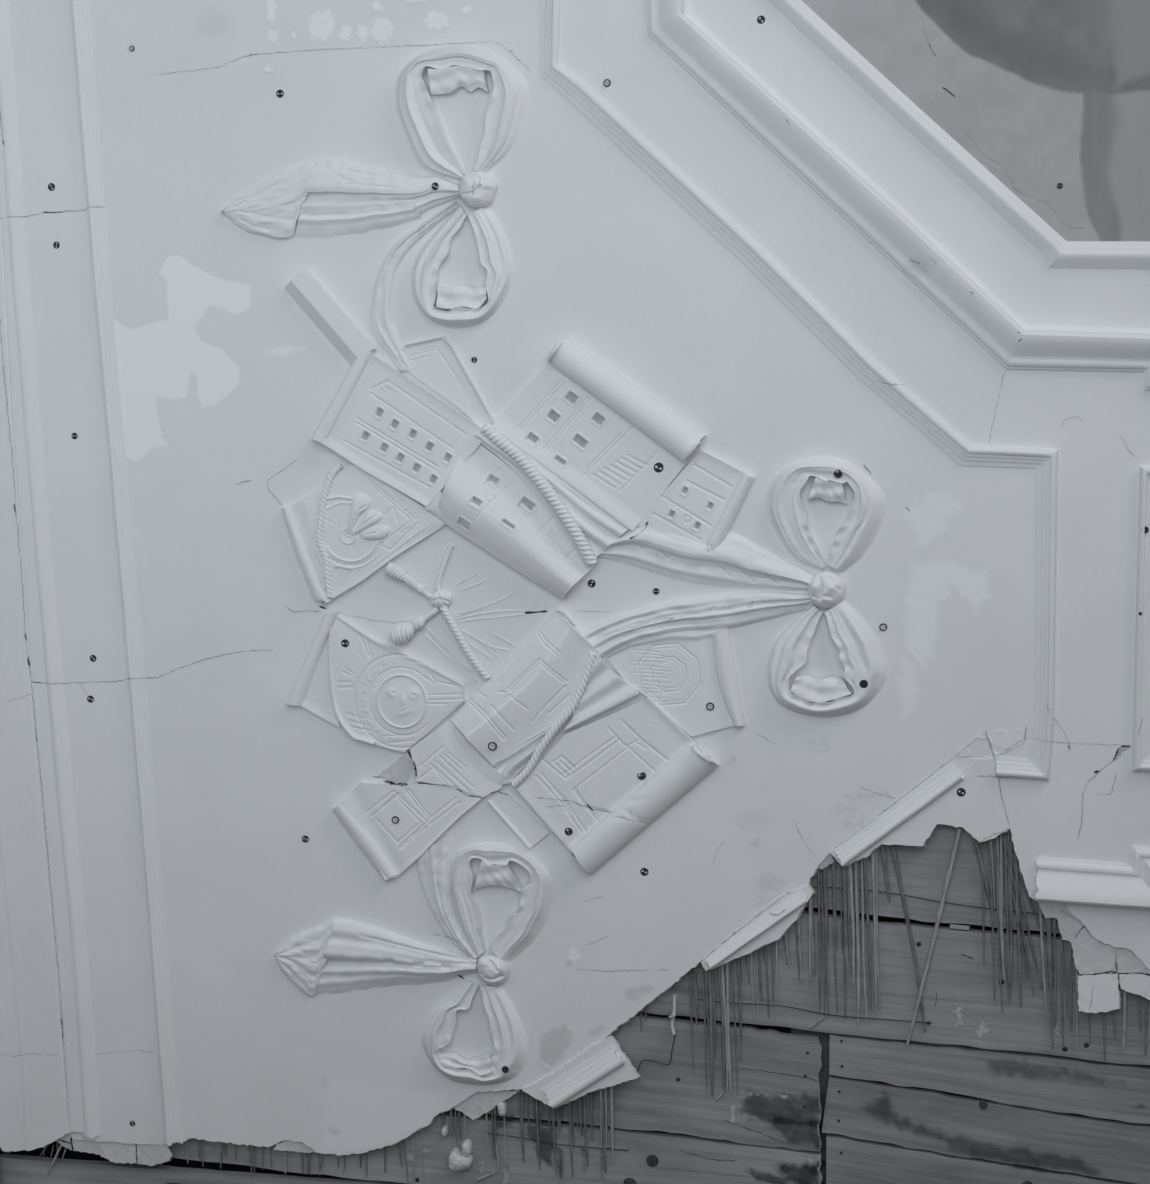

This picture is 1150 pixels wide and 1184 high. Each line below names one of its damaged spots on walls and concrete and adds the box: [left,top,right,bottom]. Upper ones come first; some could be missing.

crack [0,206,102,219]
crack [0,320,268,1120]
spalling [957,729,1025,777]
crack [795,707,1142,856]
spalling [818,853,836,870]
spalling [1038,903,1150,1014]
peeling [274,1070,520,1155]
spalling [56,1133,173,1166]
leakage [780,1162,824,1184]